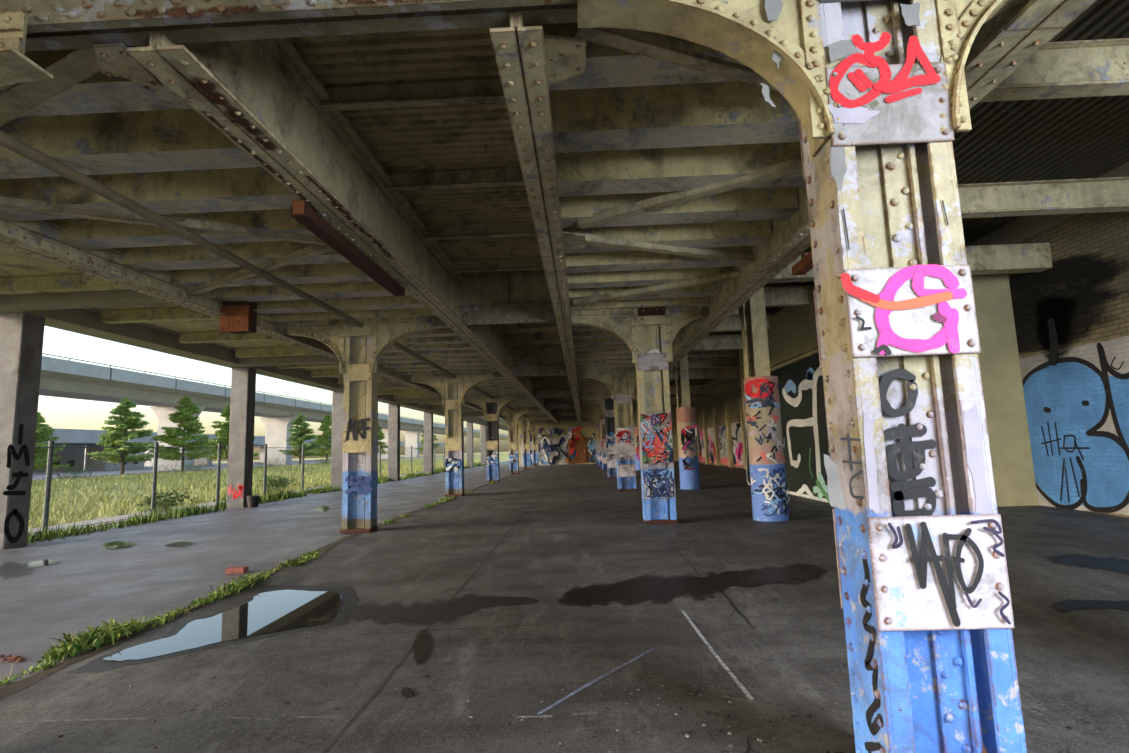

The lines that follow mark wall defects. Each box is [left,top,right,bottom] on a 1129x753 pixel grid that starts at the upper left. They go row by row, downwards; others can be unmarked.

rust [127,6,259,19]
rust [191,75,320,213]
rust [306,176,391,257]
damp [1047,554,1129,574]
damp [559,563,827,607]
damp [342,594,537,624]
damp [1052,600,1129,613]